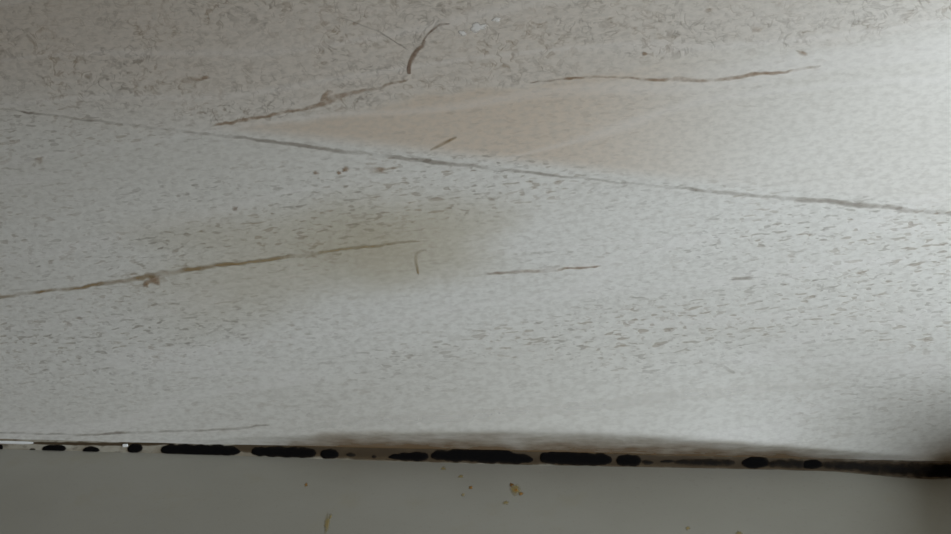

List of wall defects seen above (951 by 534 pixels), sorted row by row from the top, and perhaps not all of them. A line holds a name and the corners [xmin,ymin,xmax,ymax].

crack [407,30,432,74]
crack [217,114,272,125]
crack [320,244,390,253]
crack [184,257,283,272]
crack [37,282,103,293]
water stain [30,439,951,479]